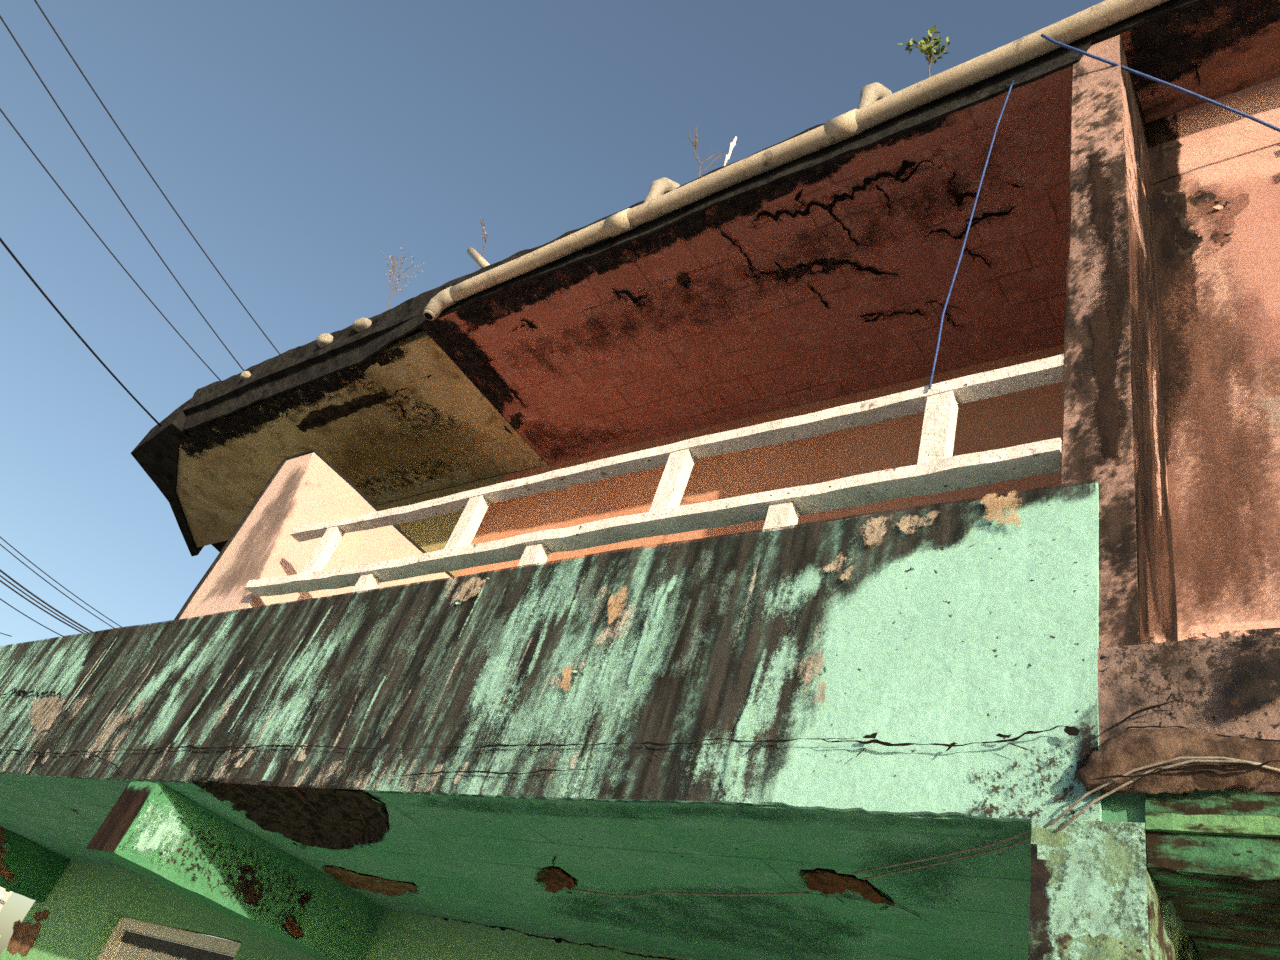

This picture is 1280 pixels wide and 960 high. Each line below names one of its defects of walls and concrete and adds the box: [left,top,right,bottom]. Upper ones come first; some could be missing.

leakage [181,347,456,458]
crack [612,288,651,306]
leakage [421,116,947,416]
crack [719,153,1024,309]
crack [860,301,966,328]
leakage [995,0,1280,718]
leakage [210,470,300,594]
crack [0,687,63,702]
spalling [190,779,389,850]
leakage [0,497,989,926]
crack [0,692,1178,841]
leakage [968,701,1098,821]